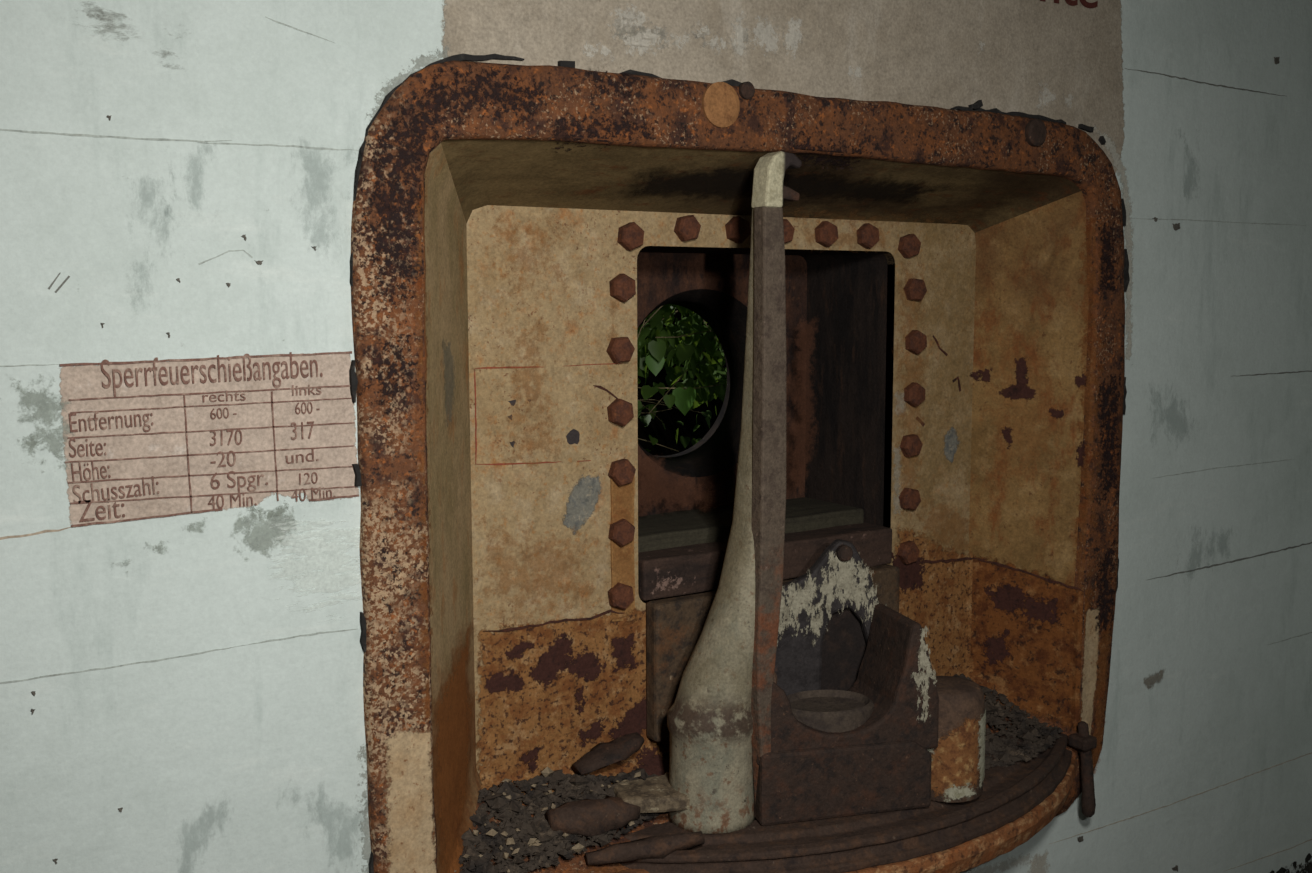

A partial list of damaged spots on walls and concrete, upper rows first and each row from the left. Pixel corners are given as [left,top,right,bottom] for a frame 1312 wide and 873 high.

rust [789,134,871,172]
rust [359,62,670,873]
rust [638,456,736,511]
rust [791,323,816,486]
rust [952,358,1036,400]
rust [1075,373,1121,500]
rust [892,527,1116,802]
water stain [1270,853,1312,873]